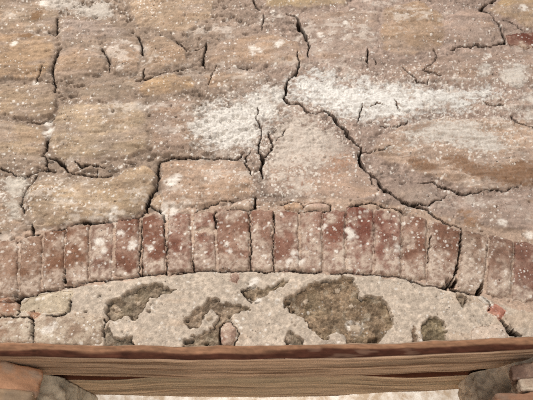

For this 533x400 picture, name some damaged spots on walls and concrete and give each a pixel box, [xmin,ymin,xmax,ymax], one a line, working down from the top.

crack [451,0,523,51]
efflorescence [501,63,527,88]
leakage [184,68,510,194]
crack [484,102,533,128]
crack [0,13,519,334]
leakage [445,156,533,185]
flaking render [105,282,177,346]
flaking render [182,278,290,347]
flaking render [284,275,394,345]
flaking render [411,316,448,342]
crack [499,318,523,337]